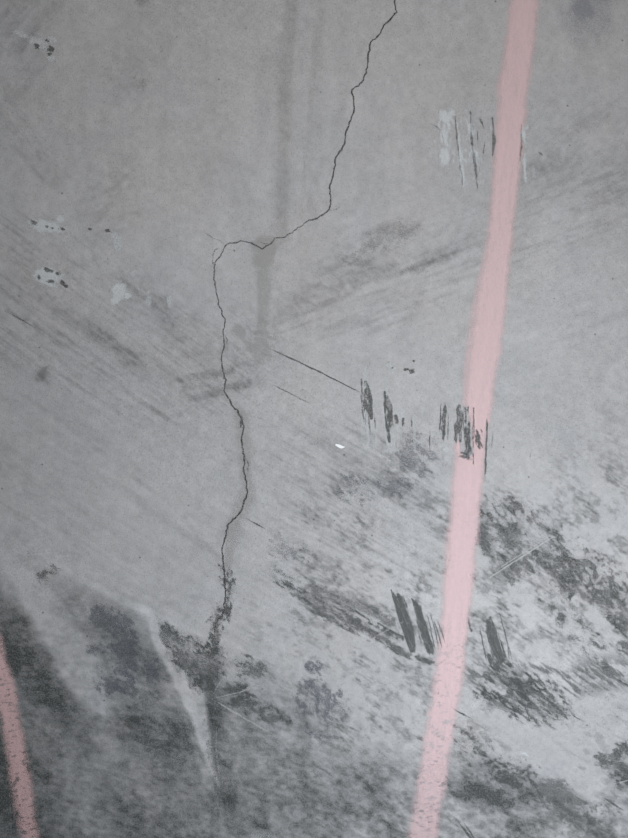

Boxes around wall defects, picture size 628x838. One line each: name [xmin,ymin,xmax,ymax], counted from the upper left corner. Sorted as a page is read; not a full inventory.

crack [205,0,398,636]